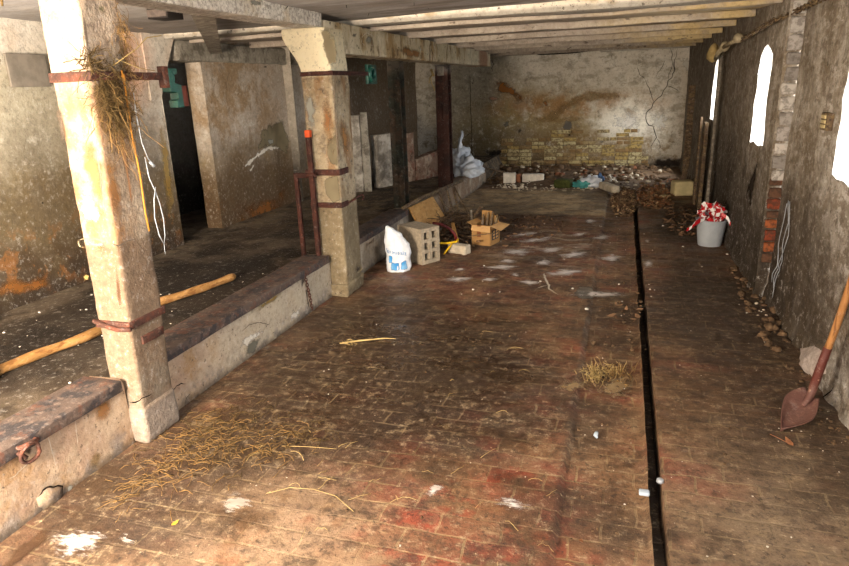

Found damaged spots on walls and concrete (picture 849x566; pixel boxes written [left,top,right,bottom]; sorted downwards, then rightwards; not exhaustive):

damp [497,81,522,100]
damp [536,92,619,123]
crack [637,49,677,146]
rust [0,279,47,294]